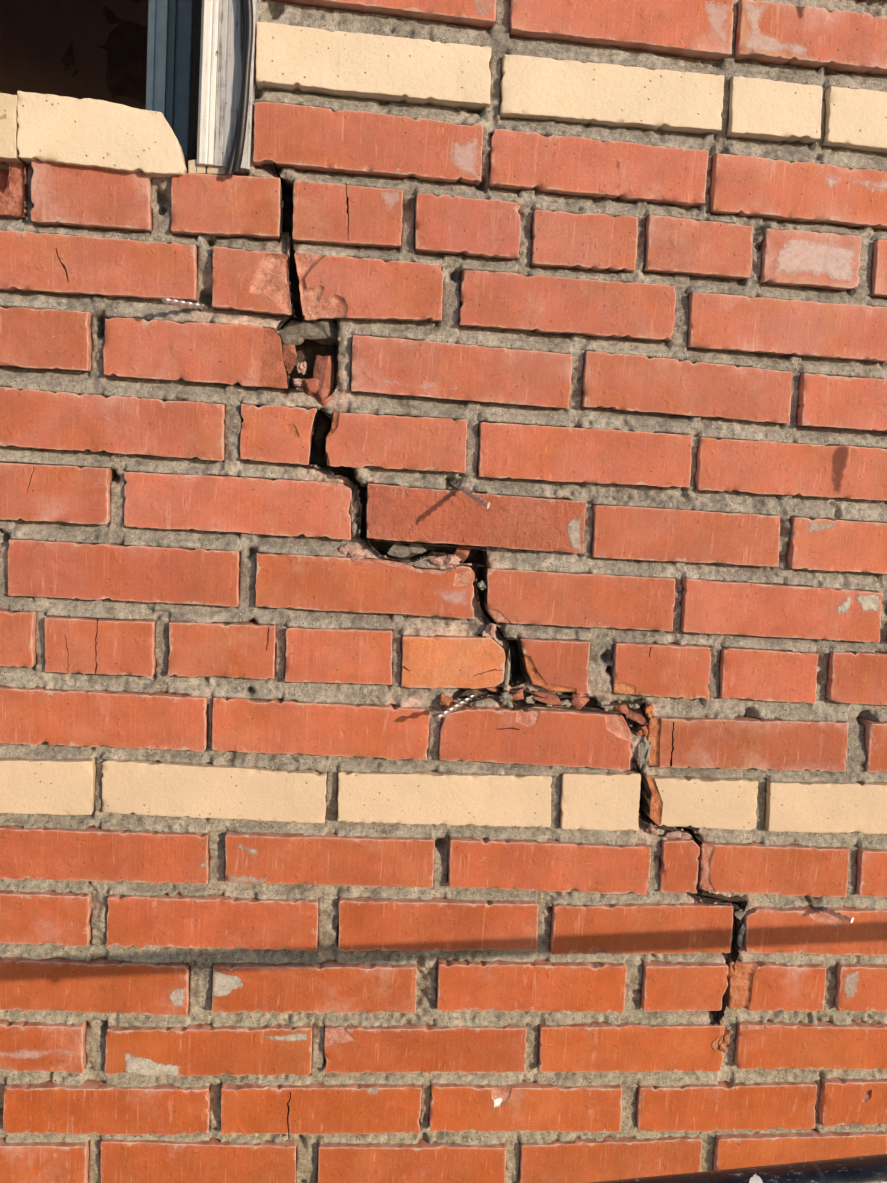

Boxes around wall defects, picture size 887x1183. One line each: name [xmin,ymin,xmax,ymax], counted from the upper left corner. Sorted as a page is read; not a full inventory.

crack [273,163,748,1053]
spalling [524,654,577,693]
spalling [614,682,636,695]
spalling [515,710,540,727]